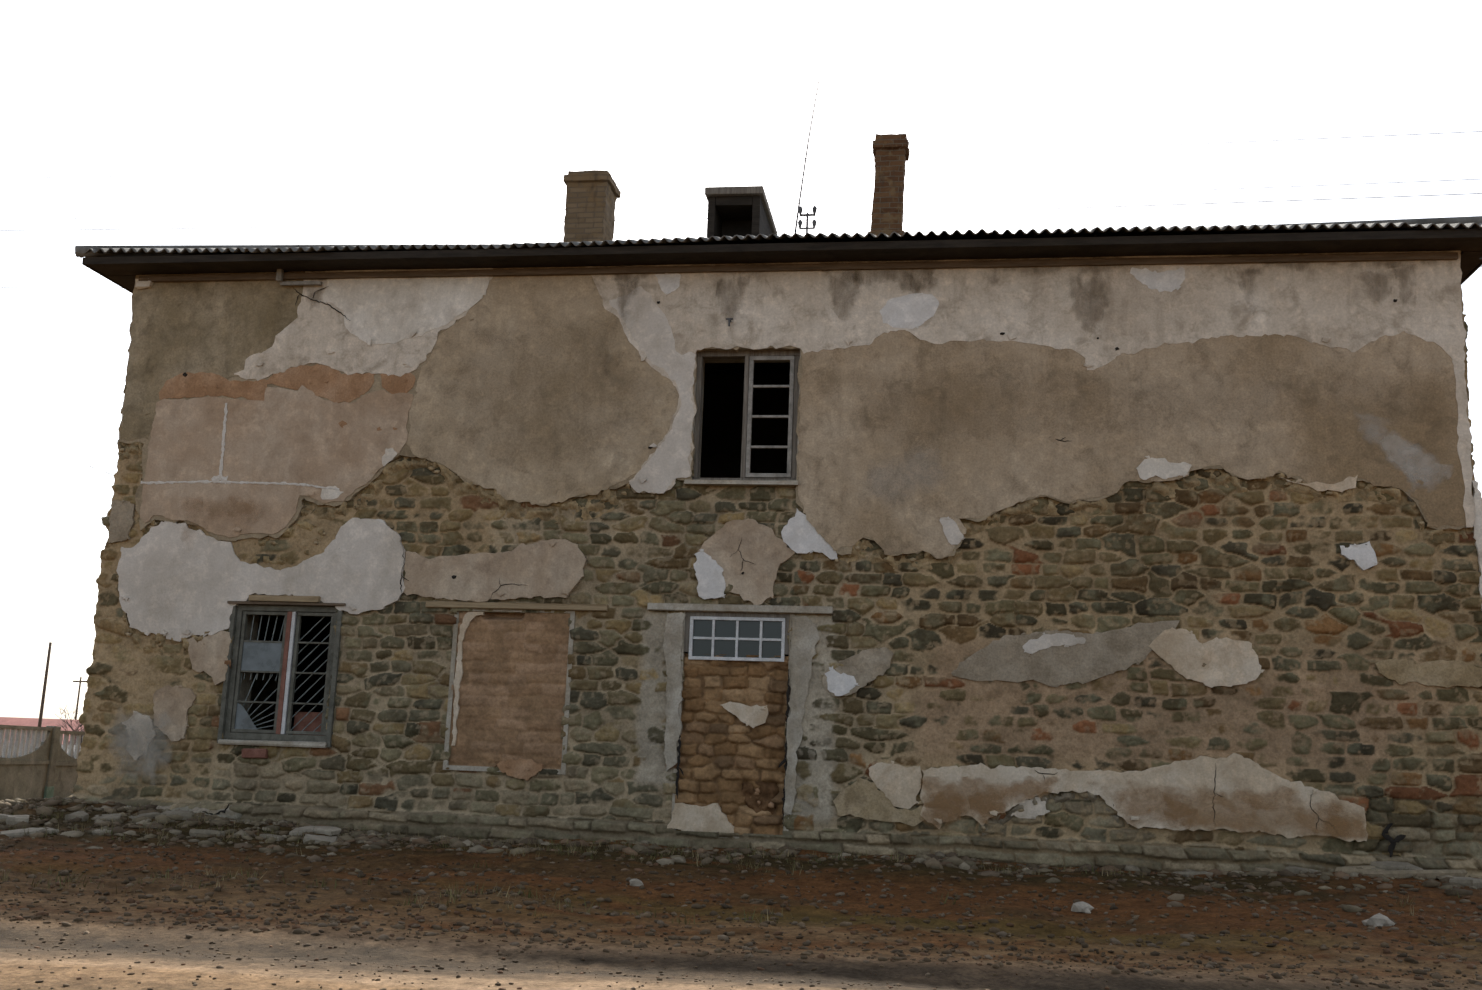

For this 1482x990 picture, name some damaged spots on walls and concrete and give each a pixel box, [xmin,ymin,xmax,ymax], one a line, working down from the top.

crack [292,286,351,321]
spalling [108,251,1482,760]
spalling [494,758,543,781]
peeling [833,753,1368,842]